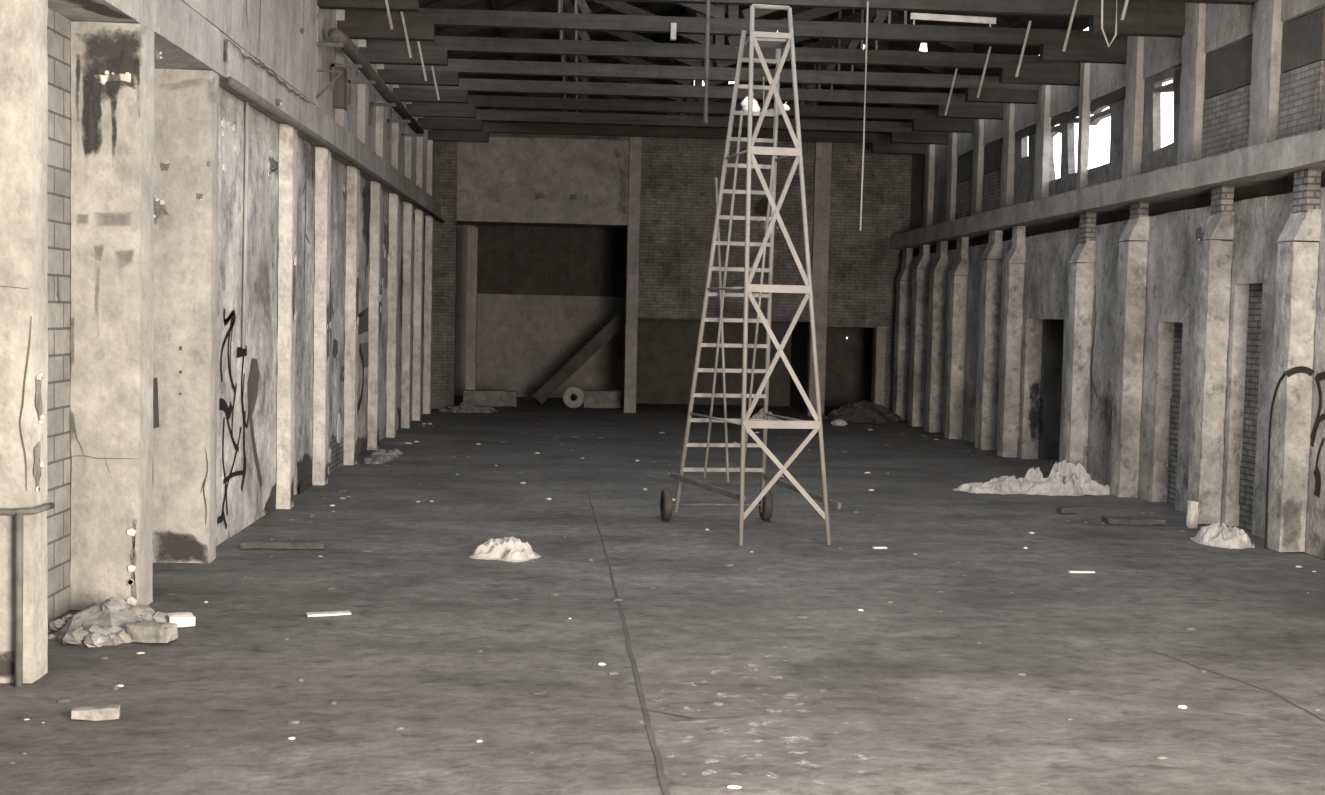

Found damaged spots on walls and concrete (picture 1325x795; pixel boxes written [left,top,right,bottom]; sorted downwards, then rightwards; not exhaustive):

damp [76,57,117,154]
crack [587,490,743,795]
crack [1139,646,1325,721]